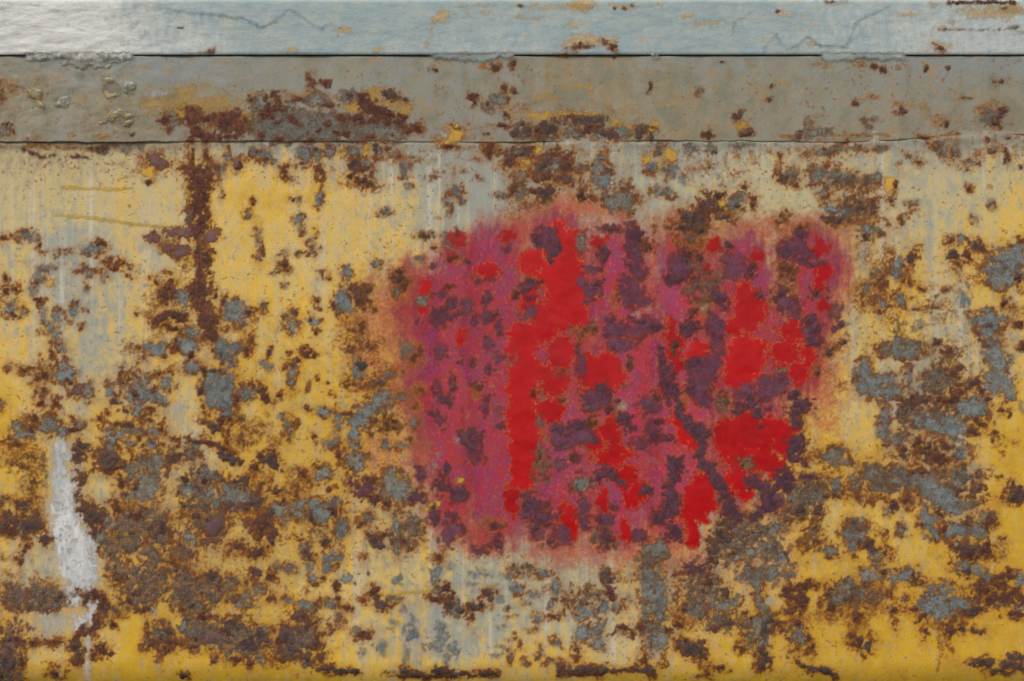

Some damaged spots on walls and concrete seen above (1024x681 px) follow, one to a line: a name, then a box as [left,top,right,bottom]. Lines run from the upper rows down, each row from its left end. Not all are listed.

rust [121,73,659,344]
peeling [437,183,467,219]
rust [260,344,320,391]
peeling [414,277,518,375]
peeling [0,227,456,637]
peeling [493,214,1024,670]
leakage [40,439,98,645]
rust [0,411,501,681]
peeling [387,464,505,584]
rust [555,641,658,681]
rust [731,565,826,674]
rust [963,566,1024,622]